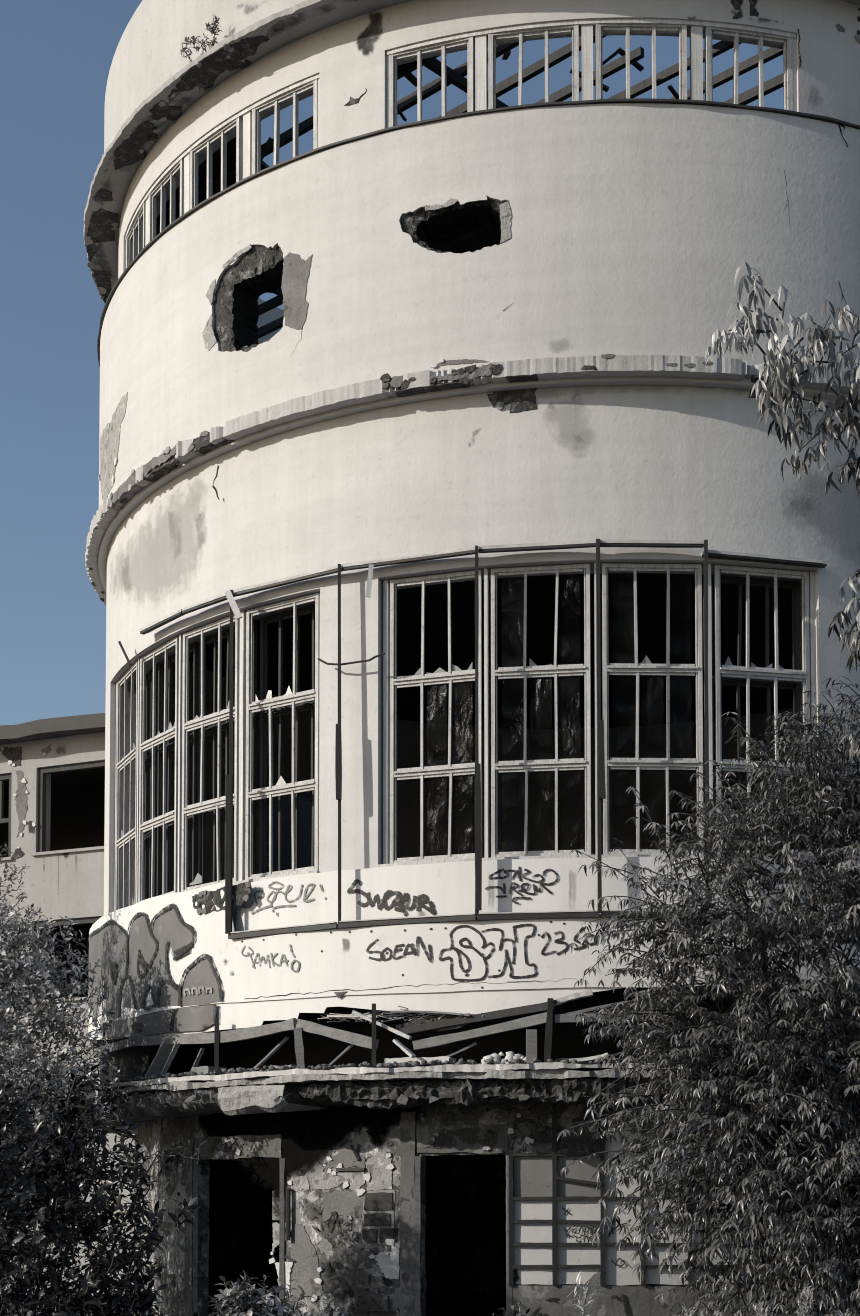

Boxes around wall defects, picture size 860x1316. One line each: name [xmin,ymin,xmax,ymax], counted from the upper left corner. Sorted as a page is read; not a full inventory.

flaking render [835,8,860,43]
flaking render [425,196,512,244]
flaking render [202,244,253,351]
flaking render [281,252,313,330]
flaking render [380,358,539,413]
flaking render [93,392,135,531]
flaking render [0,746,36,859]
flaking render [287,1146,400,1279]
flaking render [269,1222,325,1302]